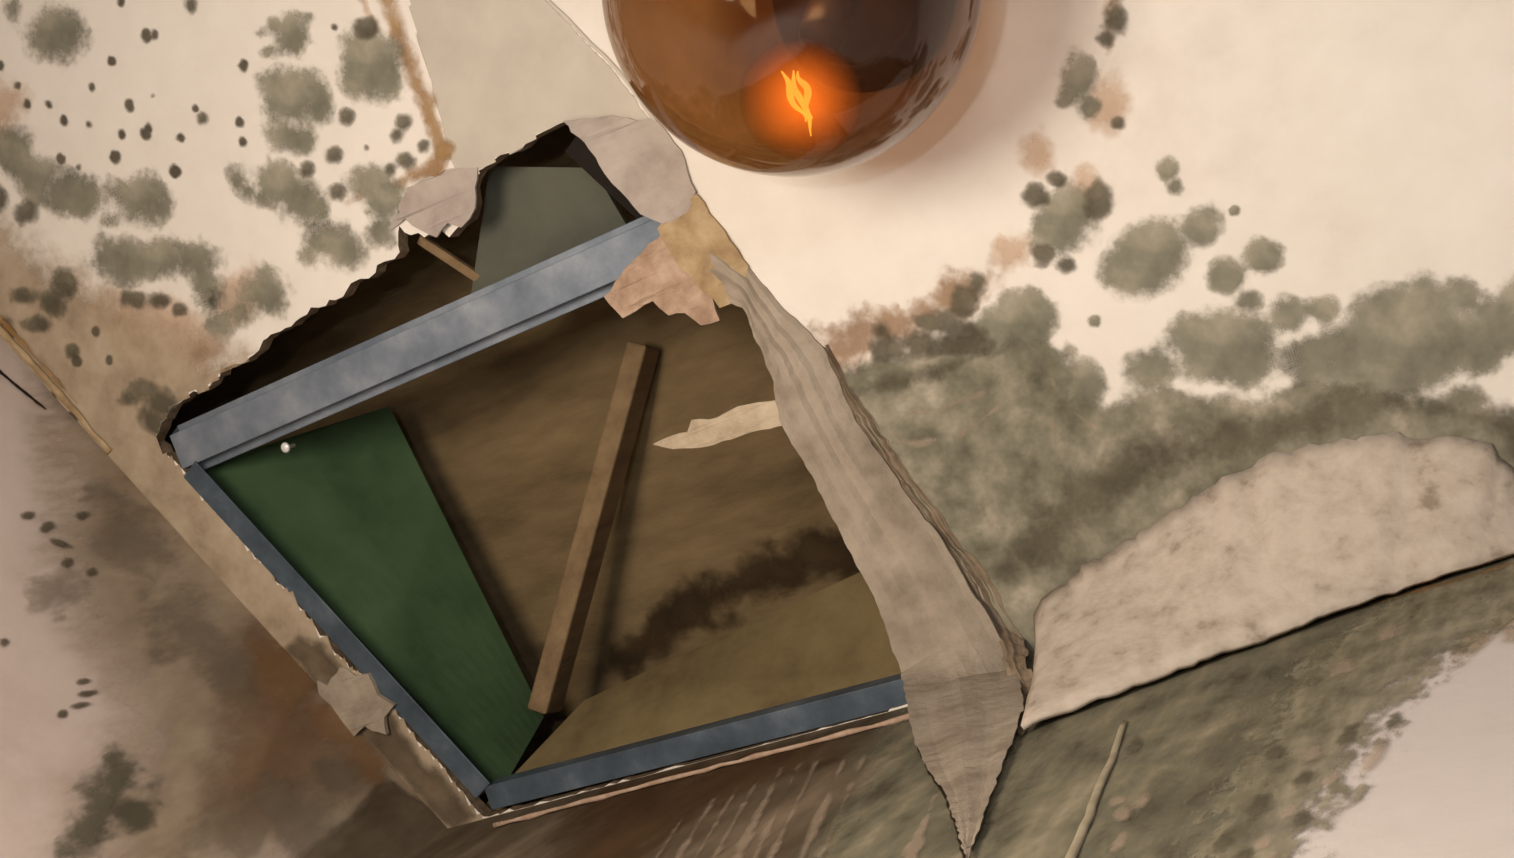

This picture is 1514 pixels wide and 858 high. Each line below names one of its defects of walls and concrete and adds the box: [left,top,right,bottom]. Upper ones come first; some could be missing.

mould [15,83,67,125]
mould [29,7,87,62]
mould [110,124,152,163]
mould [141,29,157,43]
mould [192,105,206,123]
leakage [228,0,453,268]
mould [1056,5,1126,128]
mould [1157,158,1181,193]
leakage [0,130,284,336]
mould [1023,172,1111,272]
mould [1099,205,1239,294]
leakage [0,229,1514,858]